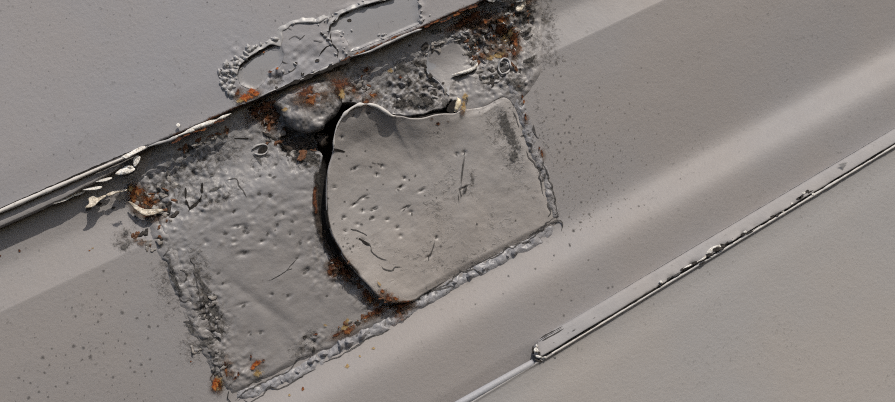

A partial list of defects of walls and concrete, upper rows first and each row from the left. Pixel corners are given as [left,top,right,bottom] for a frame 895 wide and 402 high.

rust [424,4,518,60]
rust [235,88,259,103]
rust [283,78,356,111]
peeling [233,0,531,178]
peeling [52,113,231,252]
rust [128,185,156,218]
peeling [190,295,227,377]
peeling [329,238,405,329]
rust [333,282,411,337]